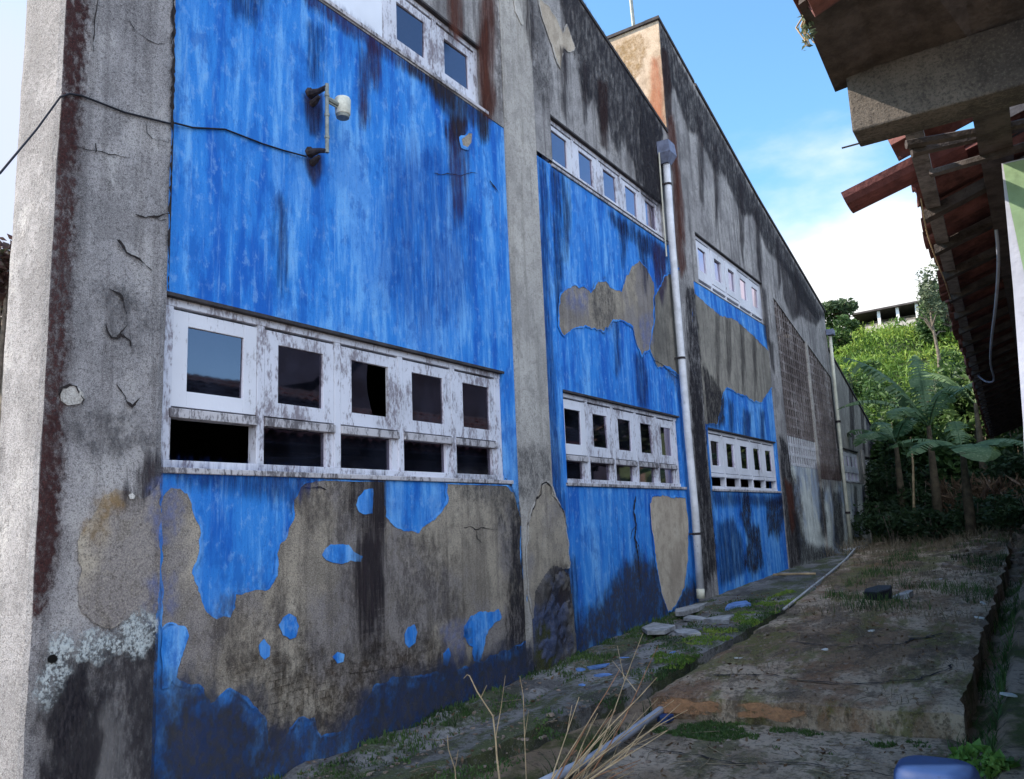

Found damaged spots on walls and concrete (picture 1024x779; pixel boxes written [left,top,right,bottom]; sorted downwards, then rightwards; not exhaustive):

crack [117,0,176,290]
rust [479,0,496,118]
rust [619,37,686,276]
water stain [526,0,825,372]
rust [32,0,91,619]
crack [106,289,132,346]
crack [117,385,140,408]
water stain [32,161,571,779]
peeling [78,479,571,739]
peeling [558,259,680,379]
peeling [649,494,689,612]
peeling [692,292,772,426]